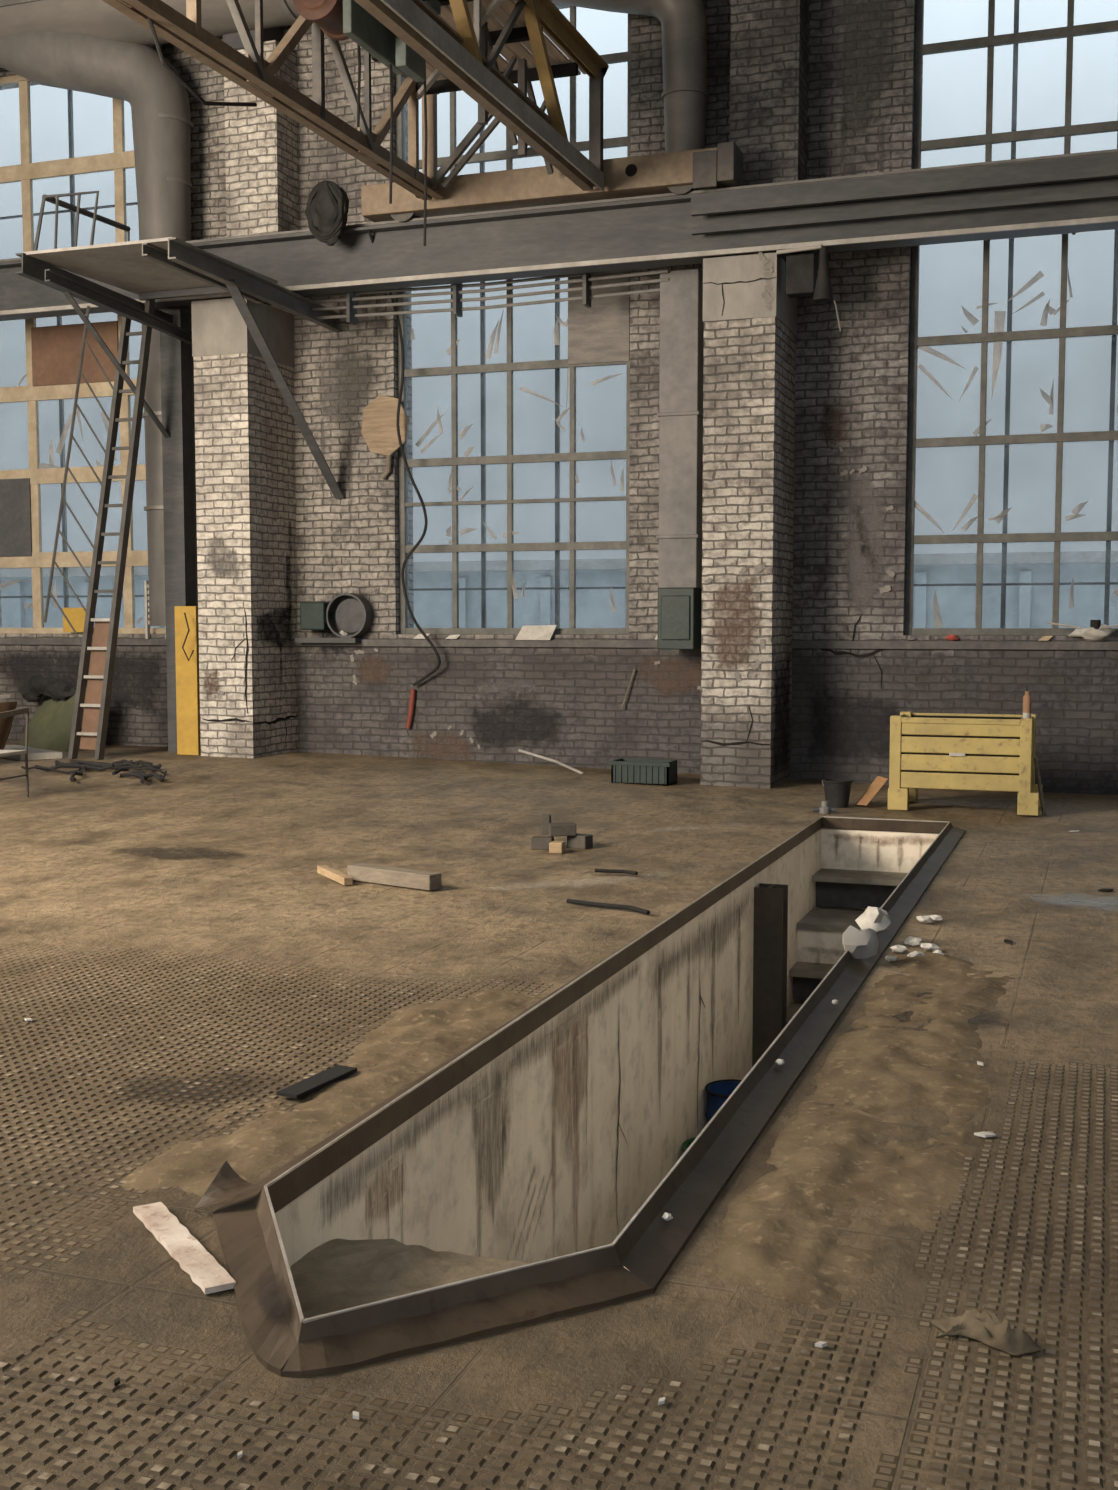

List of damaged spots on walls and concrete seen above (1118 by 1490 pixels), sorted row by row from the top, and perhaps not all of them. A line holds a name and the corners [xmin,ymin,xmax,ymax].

water stain [327,969,633,1244]
water stain [655,904,746,1049]